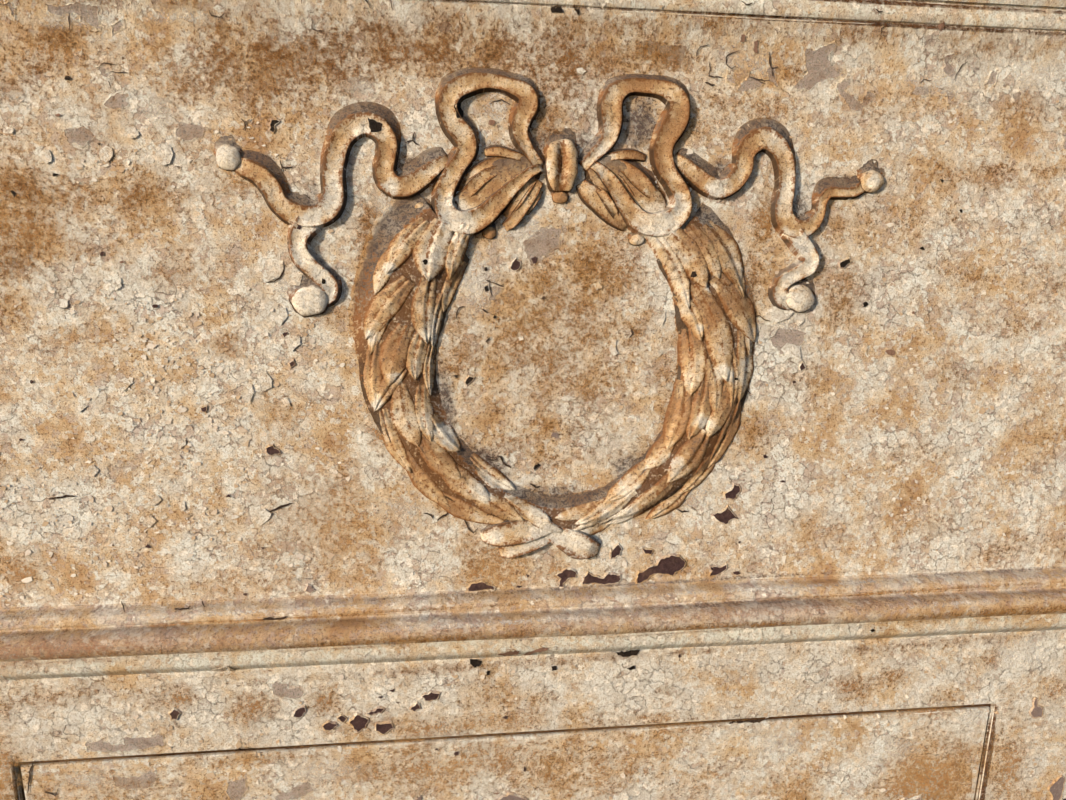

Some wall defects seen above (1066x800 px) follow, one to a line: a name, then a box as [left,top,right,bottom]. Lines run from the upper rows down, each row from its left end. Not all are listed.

water stain [563,5,1060,34]
crack [696,44,778,86]
peeling [711,483,742,525]
peeling [466,579,497,594]
peeling [555,567,622,589]
peeling [609,542,623,559]
peeling [635,546,686,584]
peeling [708,562,740,577]
peeling [321,689,441,735]
water stain [153,746,310,757]
water stain [977,704,997,800]
water stain [11,755,21,800]